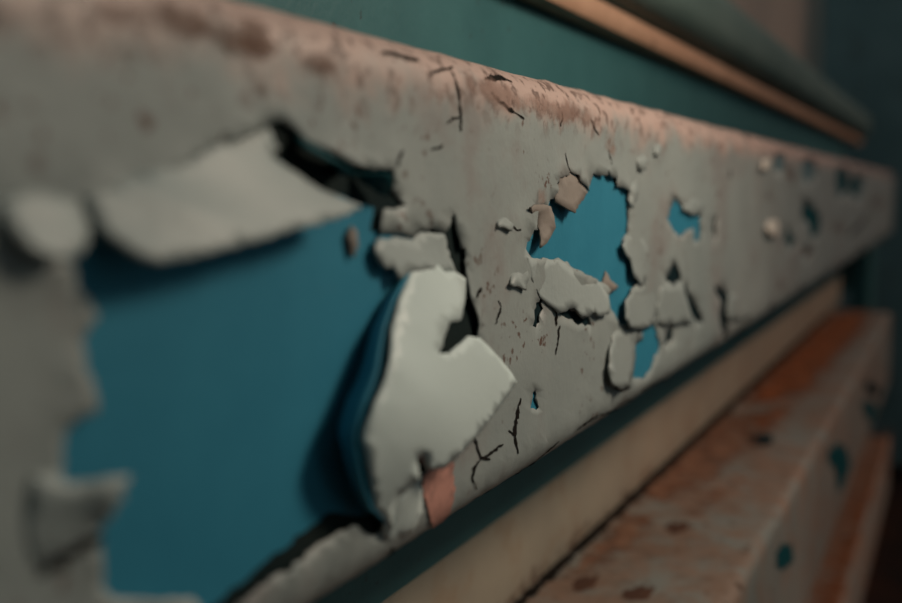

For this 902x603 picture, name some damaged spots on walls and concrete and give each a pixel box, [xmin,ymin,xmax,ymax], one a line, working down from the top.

crack [381,51,462,150]
crack [484,74,525,119]
peeling [765,219,794,250]
peeling [802,203,820,237]
peeling [509,154,704,390]
crack [476,287,502,324]
peeling [715,287,746,338]
peeling [0,128,517,603]